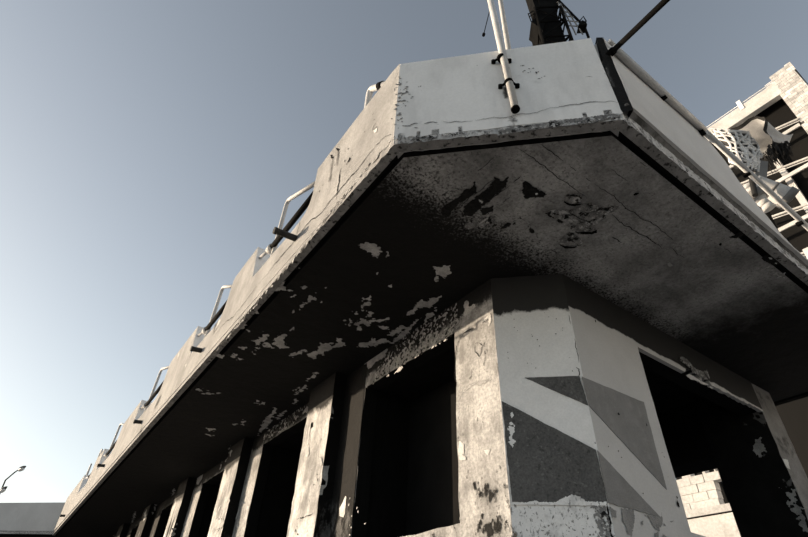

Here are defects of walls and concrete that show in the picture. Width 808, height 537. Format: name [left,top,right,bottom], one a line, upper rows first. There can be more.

spalling [498,113,620,136]
peeling [214,132,466,360]
spalling [441,177,522,229]
spalling [522,181,546,199]
spalling [545,202,619,249]
crack [521,144,683,257]
peeling [256,372,319,440]
damp [327,363,367,537]
peeling [507,412,516,448]
damp [473,482,517,537]
peeling [511,494,673,537]